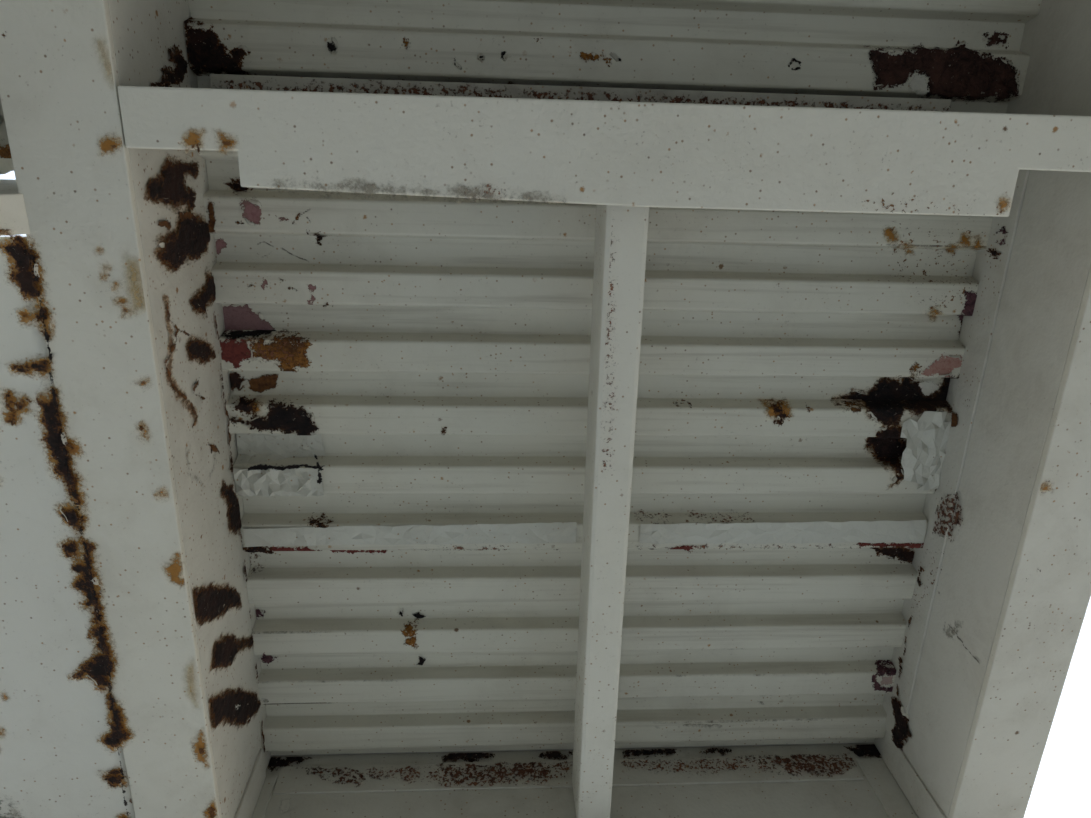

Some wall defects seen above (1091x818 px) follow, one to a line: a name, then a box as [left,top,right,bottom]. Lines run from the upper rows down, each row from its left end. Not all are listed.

rust [150,12,1019,111]
rust [144,130,210,273]
rust [224,178,253,195]
rust [0,229,52,338]
rust [11,360,48,375]
peeling [220,304,276,340]
rust [165,272,386,627]
rust [2,388,131,749]
rust [932,489,963,542]
rust [399,608,426,665]
rust [851,542,944,751]
rust [192,634,573,787]